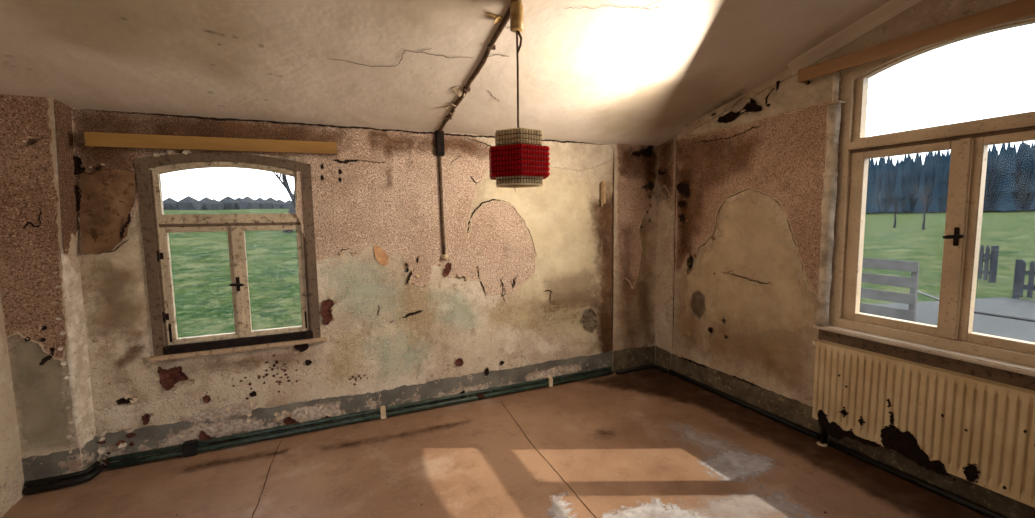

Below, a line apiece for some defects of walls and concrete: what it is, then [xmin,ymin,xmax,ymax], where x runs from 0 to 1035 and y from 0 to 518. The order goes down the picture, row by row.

crack [566,0,663,10]
crack [331,48,508,67]
peeling [687,63,842,136]
peeling [464,135,495,146]
spalling [73,156,105,211]
spalling [677,178,693,225]
peeling [467,141,613,342]
peeling [687,189,814,340]
damp [592,368,988,518]
corrosion [817,399,981,483]